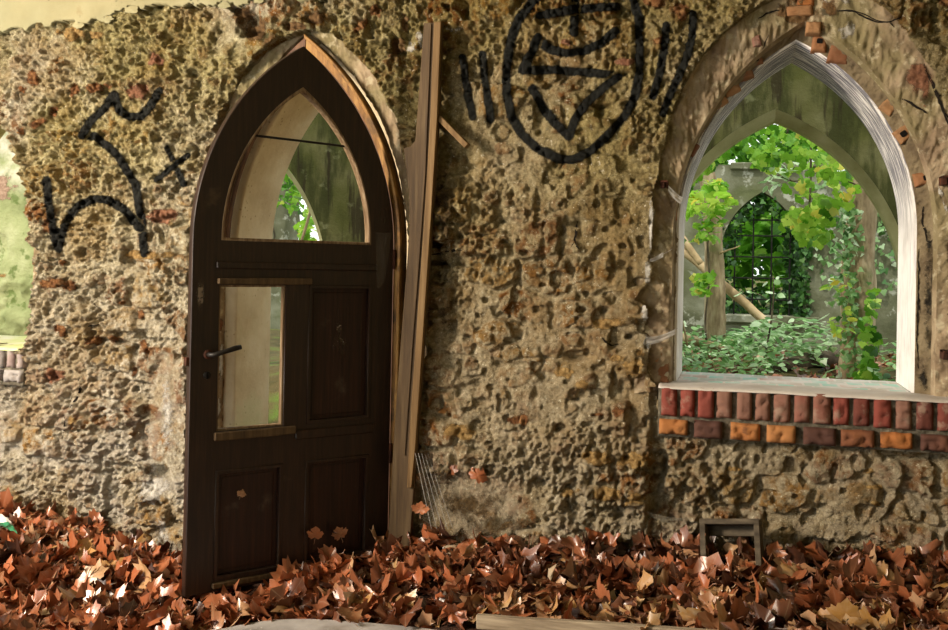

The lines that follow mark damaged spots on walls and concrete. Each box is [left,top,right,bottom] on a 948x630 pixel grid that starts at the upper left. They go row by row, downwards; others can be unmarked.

peeling [0,0,264,35]
spalling [777,0,836,30]
crack [847,11,896,27]
spalling [388,14,409,61]
crack [902,63,948,124]